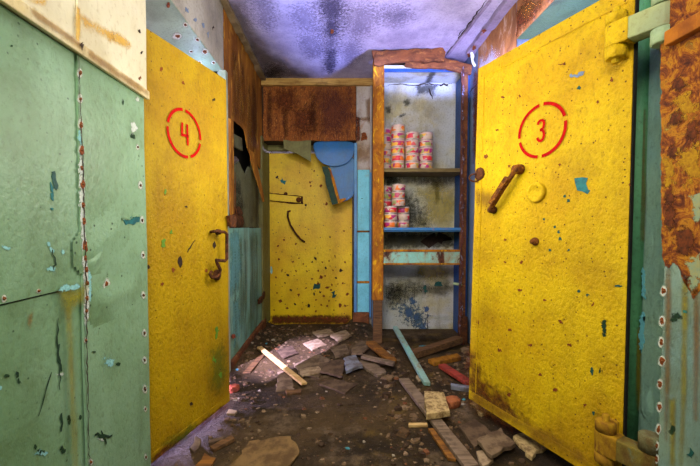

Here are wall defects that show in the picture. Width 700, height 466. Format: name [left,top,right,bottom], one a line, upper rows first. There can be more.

leakage [314,0,348,74]
rust [669,0,700,28]
rust [223,8,262,169]
rust [275,90,370,141]
rust [660,32,700,400]
rust [271,255,350,325]
leakage [386,266,451,305]